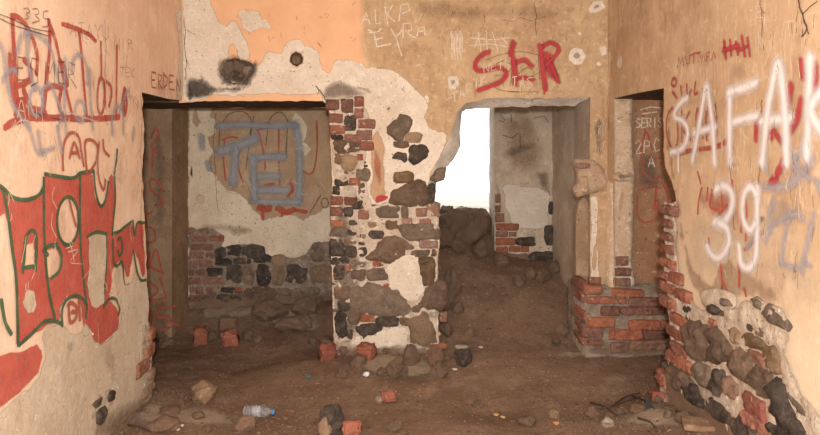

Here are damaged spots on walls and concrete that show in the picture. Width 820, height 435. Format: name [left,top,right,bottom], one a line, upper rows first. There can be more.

crack [798,0,817,38]
peeling [0,265,156,435]
flaking render [176,0,448,355]
flaking render [494,183,553,262]
spalling [613,255,635,287]
flaking render [655,201,820,435]